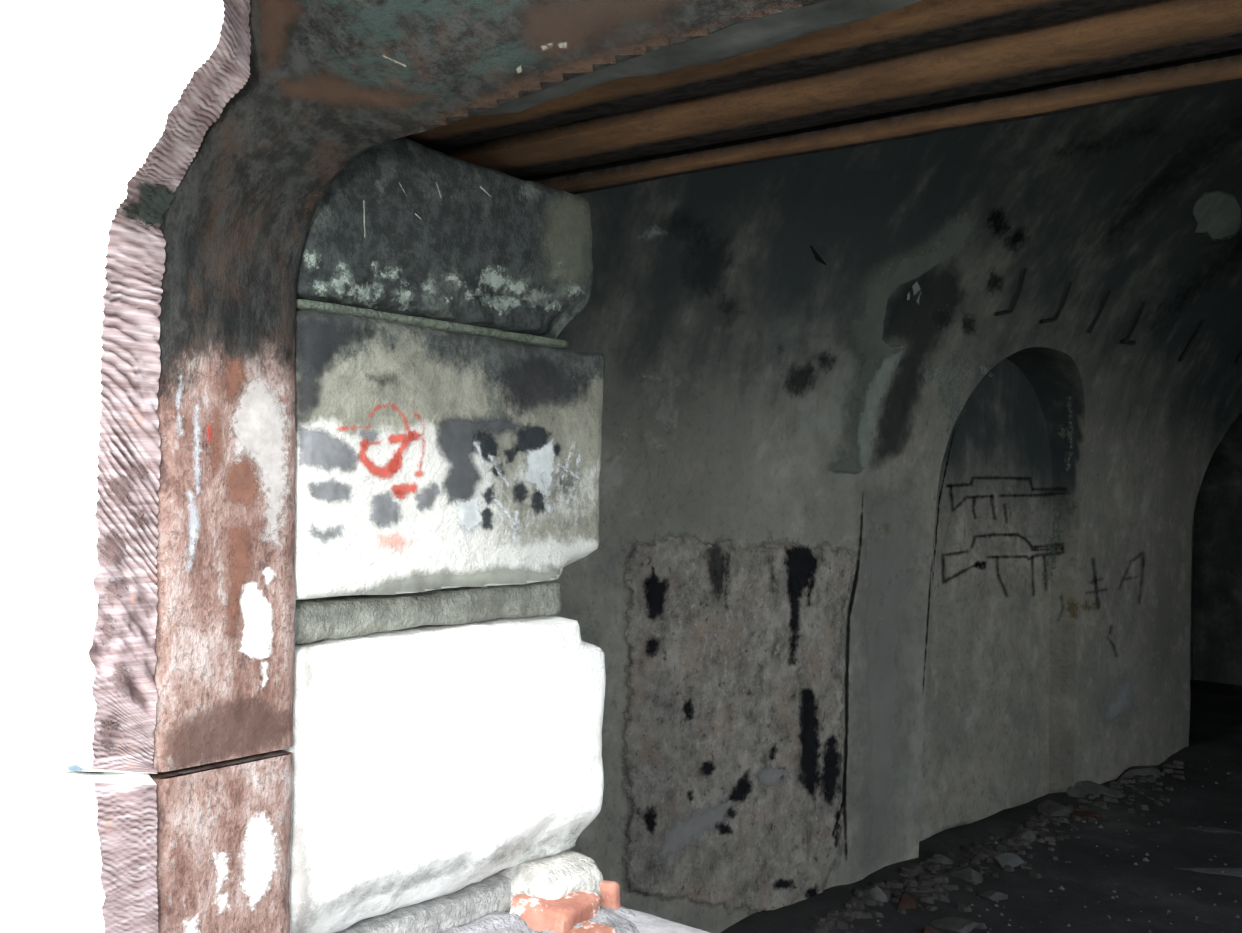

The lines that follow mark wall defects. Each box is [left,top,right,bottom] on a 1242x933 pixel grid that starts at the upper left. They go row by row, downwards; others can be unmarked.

corrosion [207,409,258,506]
corrosion [226,522,250,637]
peeling [240,568,274,686]
water stain [646,637,659,657]
water stain [789,562,817,665]
corrosion [172,647,311,768]
spalling [510,534,855,933]
water stain [820,736,843,847]
peeling [213,812,277,913]
corrosion [292,800,310,926]
peeling [183,915,199,933]